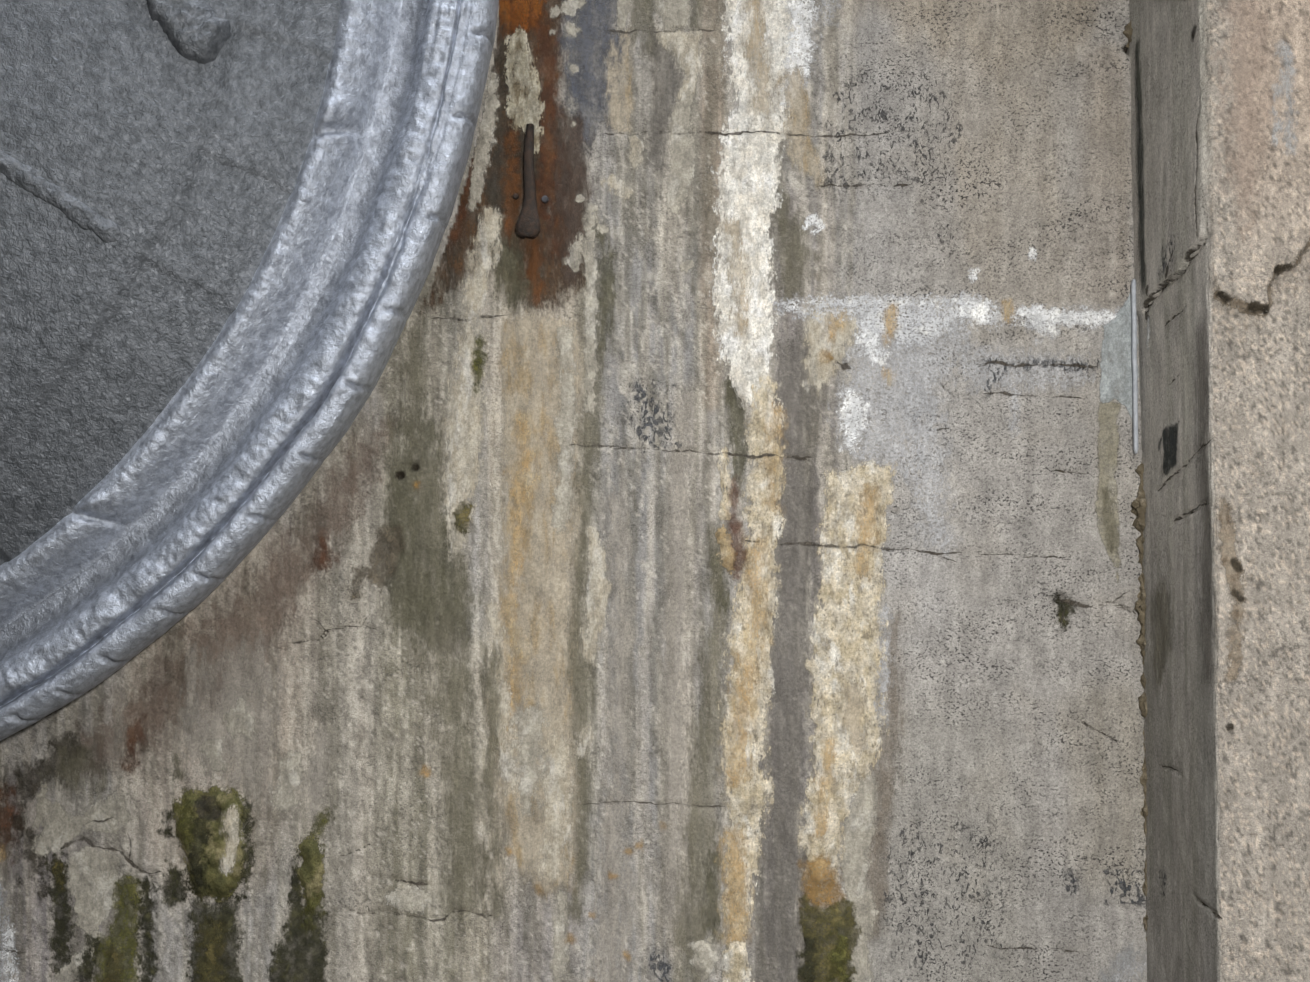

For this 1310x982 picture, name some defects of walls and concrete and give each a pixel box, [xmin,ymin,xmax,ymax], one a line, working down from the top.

corrosion [424,0,586,309]
damp [383,0,703,982]
damp [687,0,1119,982]
crack [1059,591,1136,625]
damp [12,733,131,982]